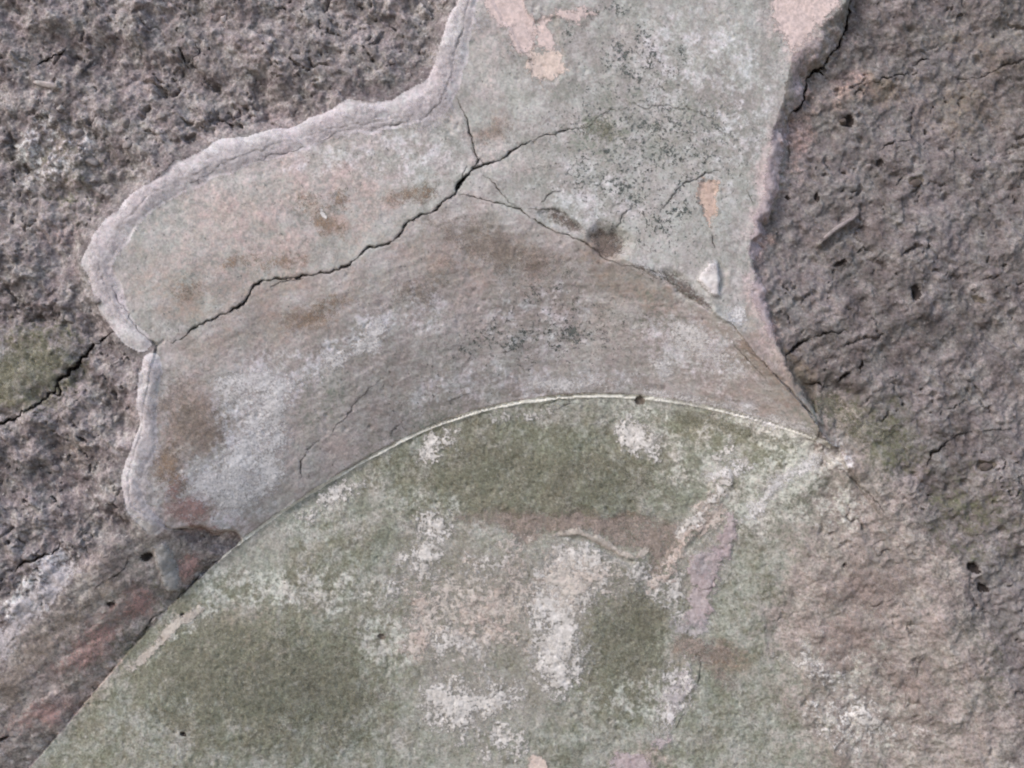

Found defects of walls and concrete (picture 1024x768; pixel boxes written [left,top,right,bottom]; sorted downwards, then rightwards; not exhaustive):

peeling [484,0,598,90]
crack [788,2,851,121]
crack [173,102,729,343]
crack [0,288,147,424]
damp [123,315,387,522]
damp [523,375,620,392]
crack [723,318,863,418]
damp [708,459,756,482]
damp [746,455,823,520]